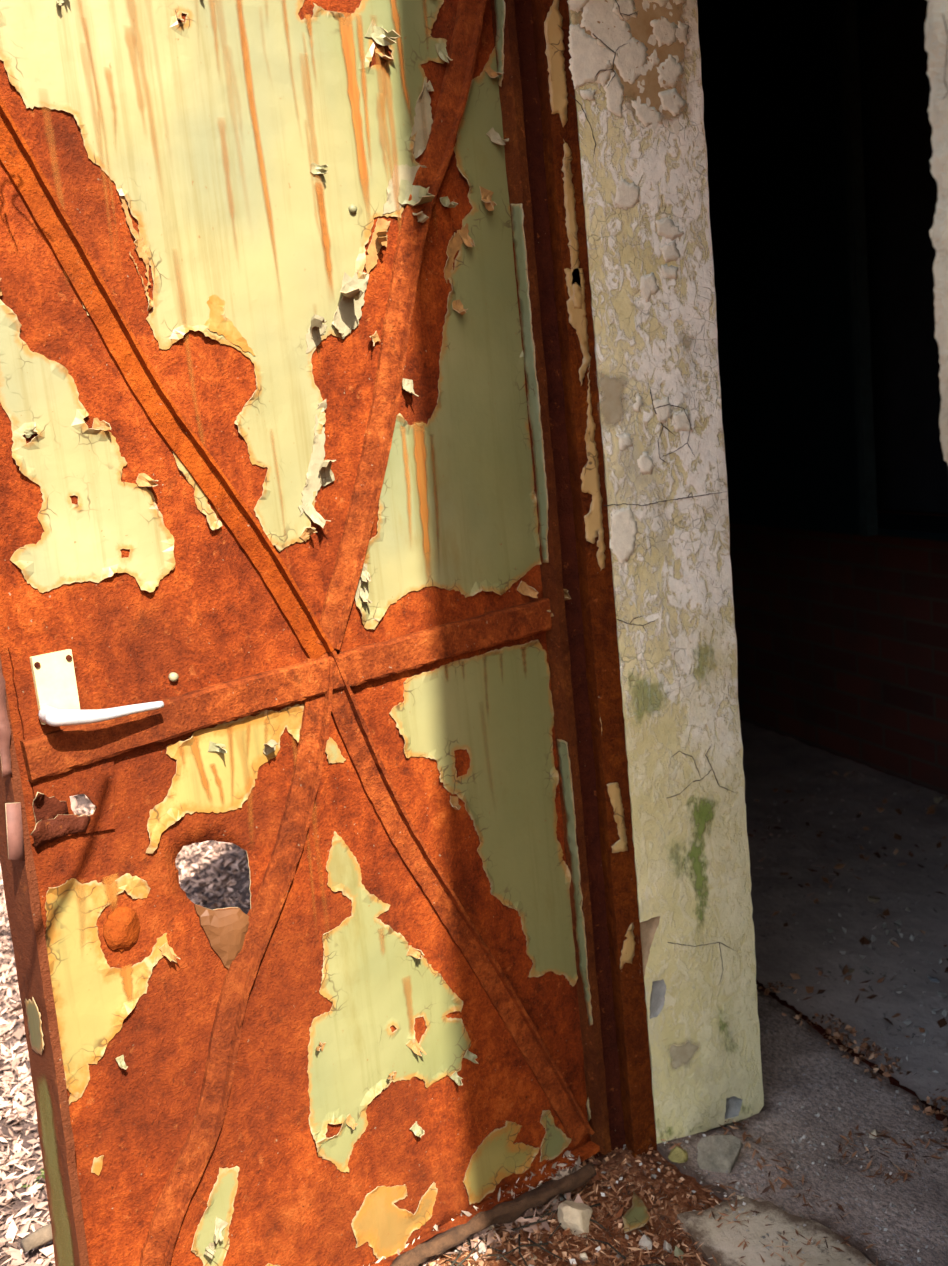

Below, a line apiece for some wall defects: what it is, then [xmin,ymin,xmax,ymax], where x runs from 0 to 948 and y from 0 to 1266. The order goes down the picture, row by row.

crack [939,14,948,100]
peeling [0,0,549,630]
peeling [544,0,695,570]
peeling [307,831,478,1172]
peeling [389,640,593,1026]